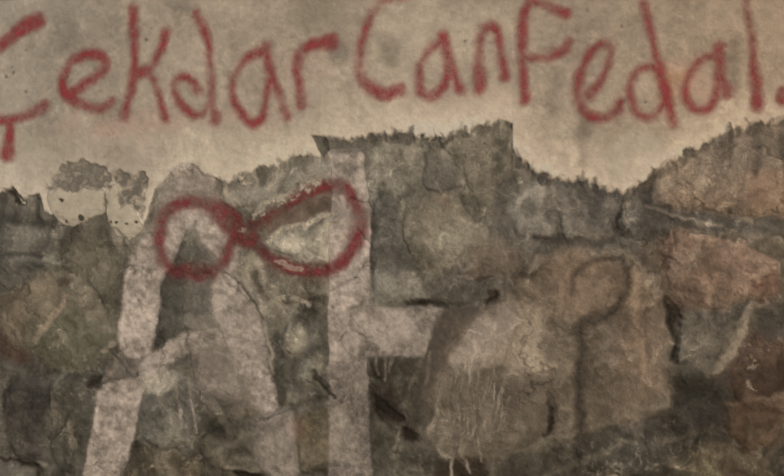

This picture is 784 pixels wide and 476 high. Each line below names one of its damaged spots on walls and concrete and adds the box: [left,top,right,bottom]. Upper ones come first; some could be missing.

spalling [327,138,365,152]
peeling [47,159,148,238]
peeling [275,260,303,272]
leakage [423,308,510,476]